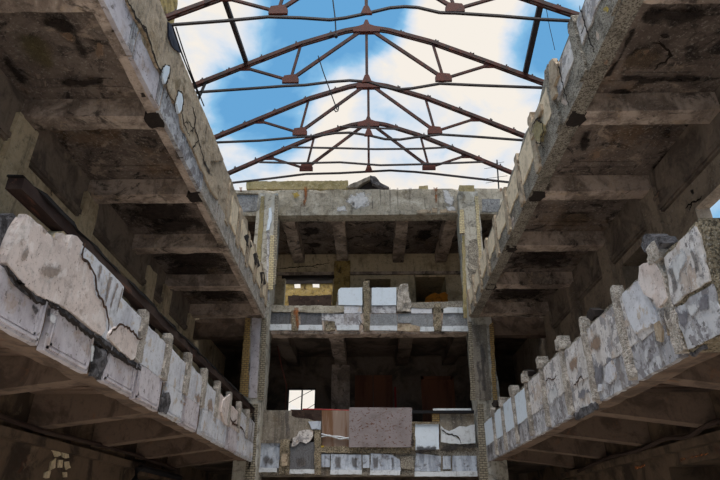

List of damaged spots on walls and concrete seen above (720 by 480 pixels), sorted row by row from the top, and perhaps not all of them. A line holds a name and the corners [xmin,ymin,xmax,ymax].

leakage [43,19,104,58]
crack [653,41,673,70]
leakage [62,78,103,86]
flaking render [161,65,170,84]
crack [127,0,206,165]
flaking render [175,92,183,114]
spalling [566,110,587,127]
flaking render [0,214,142,380]
crack [6,243,143,371]
spalling [158,392,171,414]